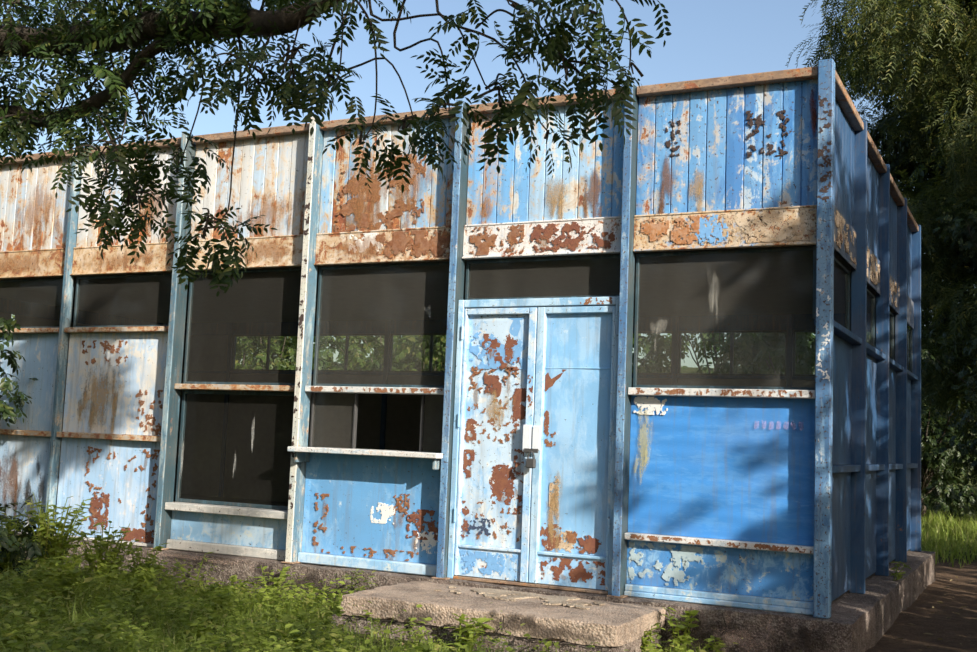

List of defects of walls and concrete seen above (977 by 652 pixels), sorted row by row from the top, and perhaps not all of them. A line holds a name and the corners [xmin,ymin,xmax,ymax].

peeling [834,210,899,307]
corrosion [79,371,118,434]
peeling [460,317,533,542]
peeling [544,411,556,447]
peeling [545,369,566,391]
damp [634,414,649,478]
peeling [312,493,330,554]
peeling [341,494,439,561]
corrosion [548,480,559,553]
peeling [540,523,605,585]
peeling [628,534,711,586]
spalling [434,586,605,609]